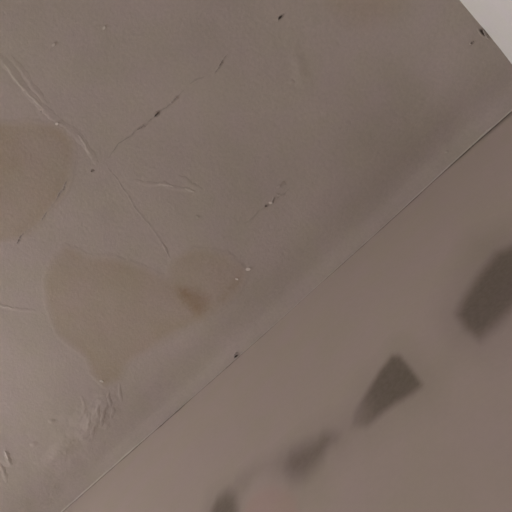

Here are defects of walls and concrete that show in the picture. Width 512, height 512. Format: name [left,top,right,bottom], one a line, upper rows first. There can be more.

crack [108,54,228,158]
water stain [0,116,80,245]
water stain [40,242,251,389]
crack [61,109,512,512]